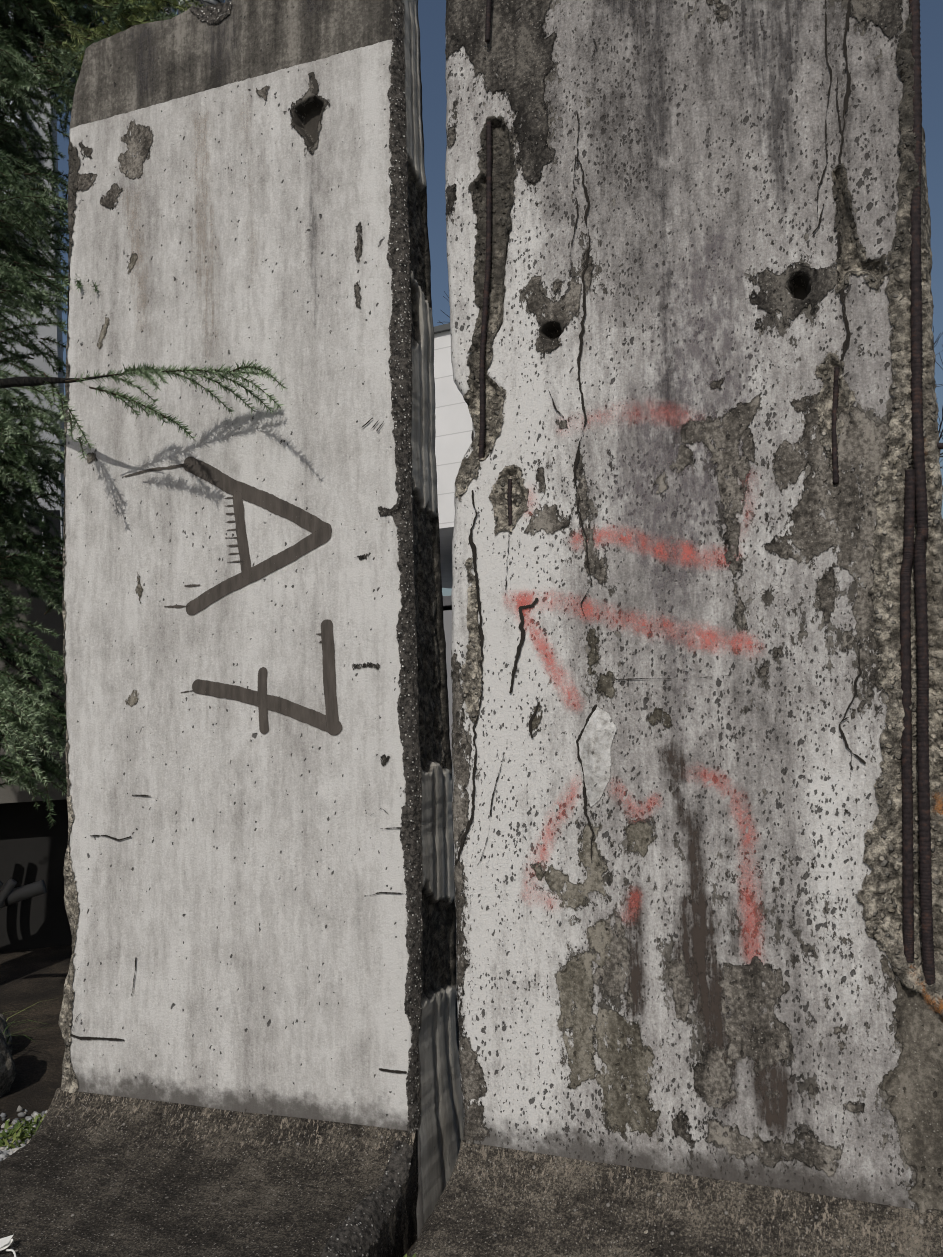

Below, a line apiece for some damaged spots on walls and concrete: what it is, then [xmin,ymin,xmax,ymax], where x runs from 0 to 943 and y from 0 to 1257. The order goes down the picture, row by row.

peeling [445,0,557,501]
crack [549,114,593,638]
crack [811,0,851,361]
spalling [58,119,154,1093]
spalling [319,0,423,1257]
crack [455,490,539,865]
crack [576,704,597,863]
leakage [627,888,644,1020]
leakage [662,743,736,1109]
peeling [556,912,842,1177]
leakage [752,1050,795,1137]
spalling [749,0,943,1213]